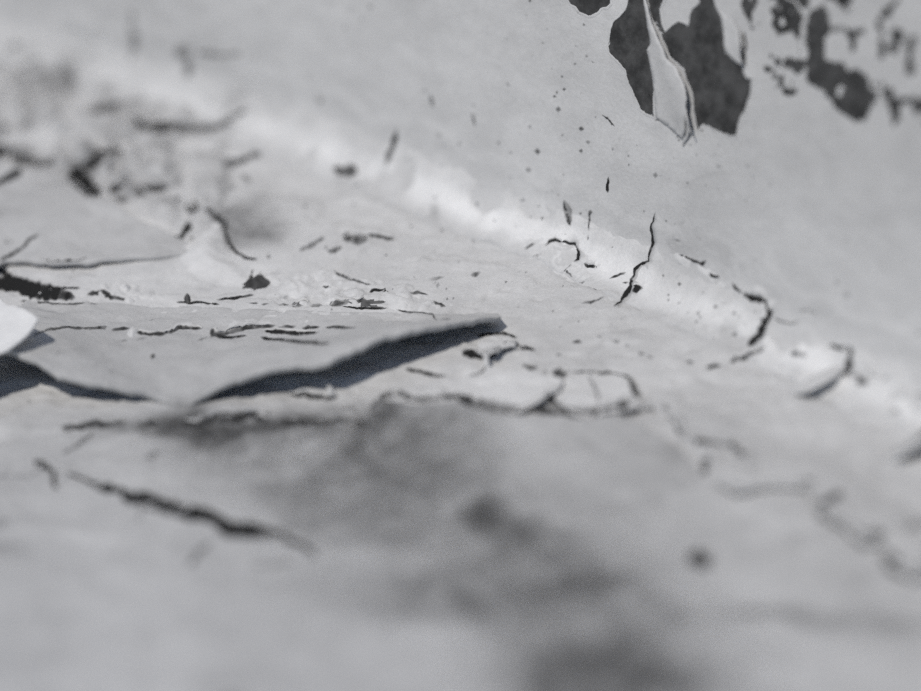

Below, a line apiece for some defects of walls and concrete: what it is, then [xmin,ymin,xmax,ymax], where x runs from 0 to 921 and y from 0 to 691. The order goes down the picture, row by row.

peeling [567,0,759,146]
peeling [763,0,921,127]
crack [527,211,662,308]
crack [681,255,806,369]
crack [825,339,864,378]